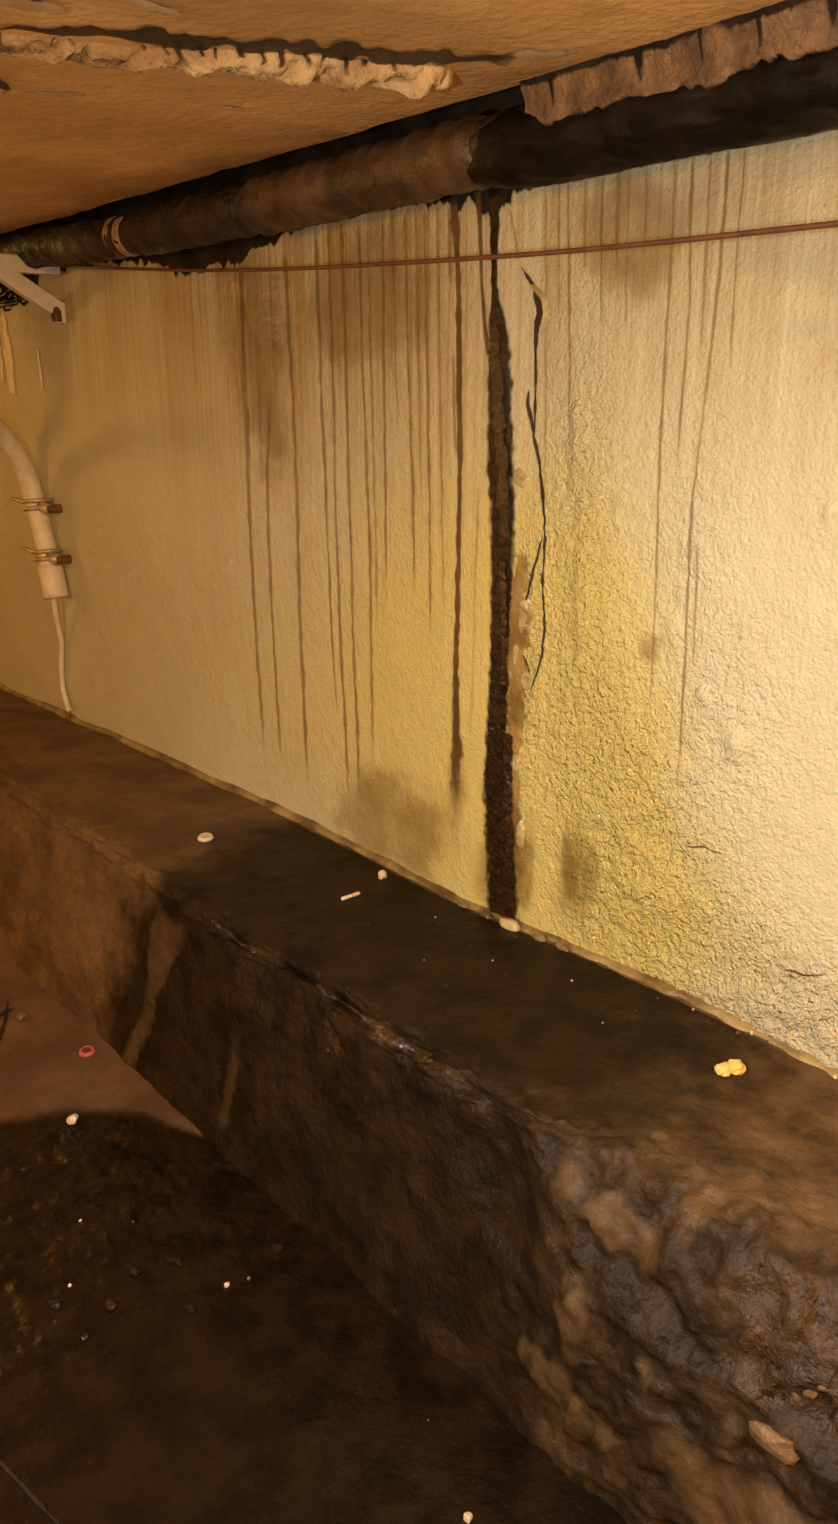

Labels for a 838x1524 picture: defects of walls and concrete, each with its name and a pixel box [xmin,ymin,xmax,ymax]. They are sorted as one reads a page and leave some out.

spalling [0,33,454,100]
spalling [519,0,838,126]
leakage [0,85,525,235]
leakage [60,232,293,335]
leakage [712,161,744,335]
leakage [248,475,272,611]
leakage [315,232,386,761]
leakage [410,383,430,517]
leakage [415,188,532,919]
crack [513,228,551,695]
leakage [658,355,686,489]